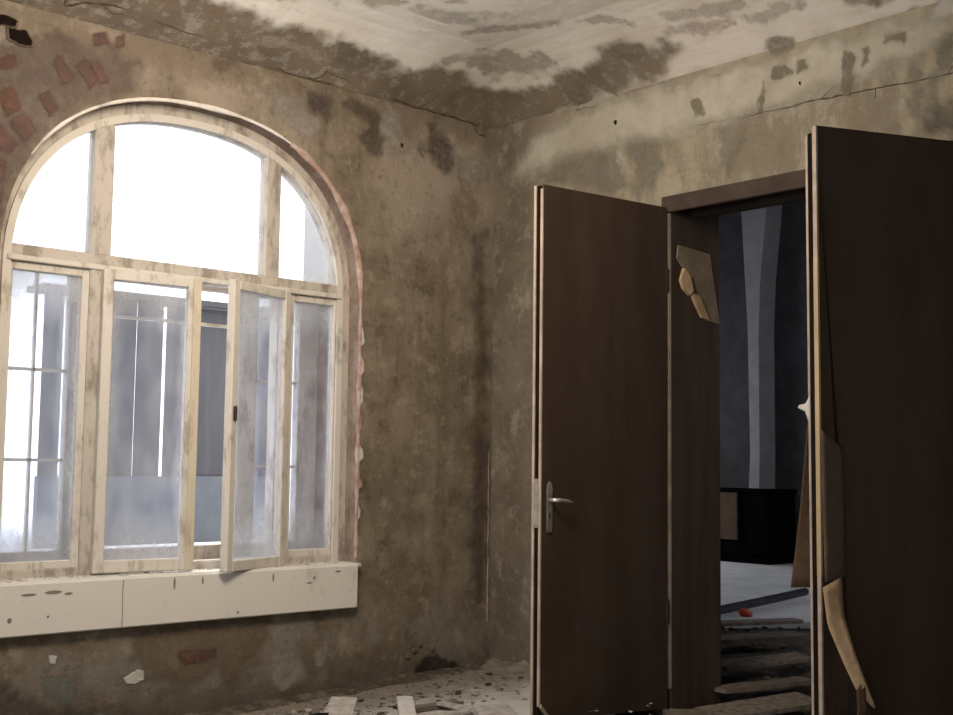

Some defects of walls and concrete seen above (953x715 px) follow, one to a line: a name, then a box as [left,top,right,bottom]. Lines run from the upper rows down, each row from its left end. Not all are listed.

water stain [7,0,676,153]
water stain [691,99,705,115]
water stain [758,60,807,112]
crack [689,66,953,128]
water stain [841,48,869,96]
water stain [533,138,663,198]